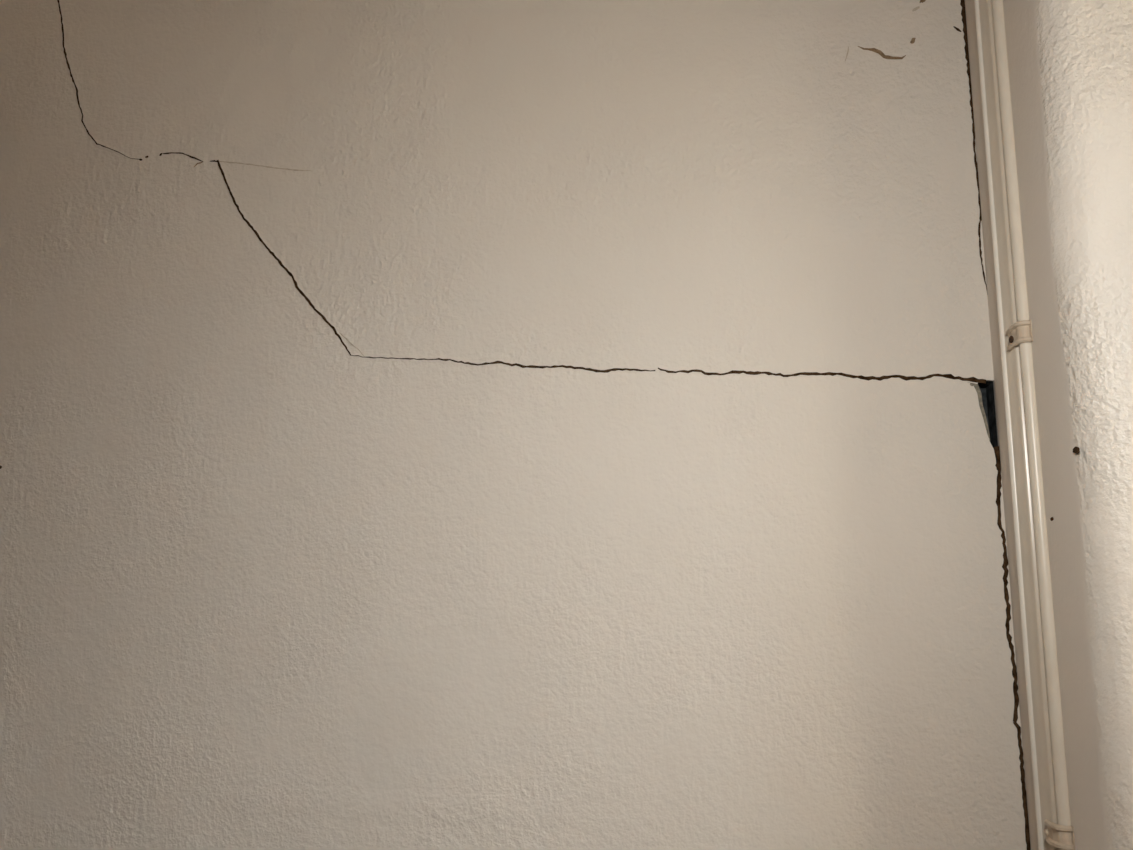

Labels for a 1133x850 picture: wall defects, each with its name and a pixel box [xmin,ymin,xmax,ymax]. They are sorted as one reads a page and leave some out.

crack [56,0,988,384]
crack [994,446,1031,850]